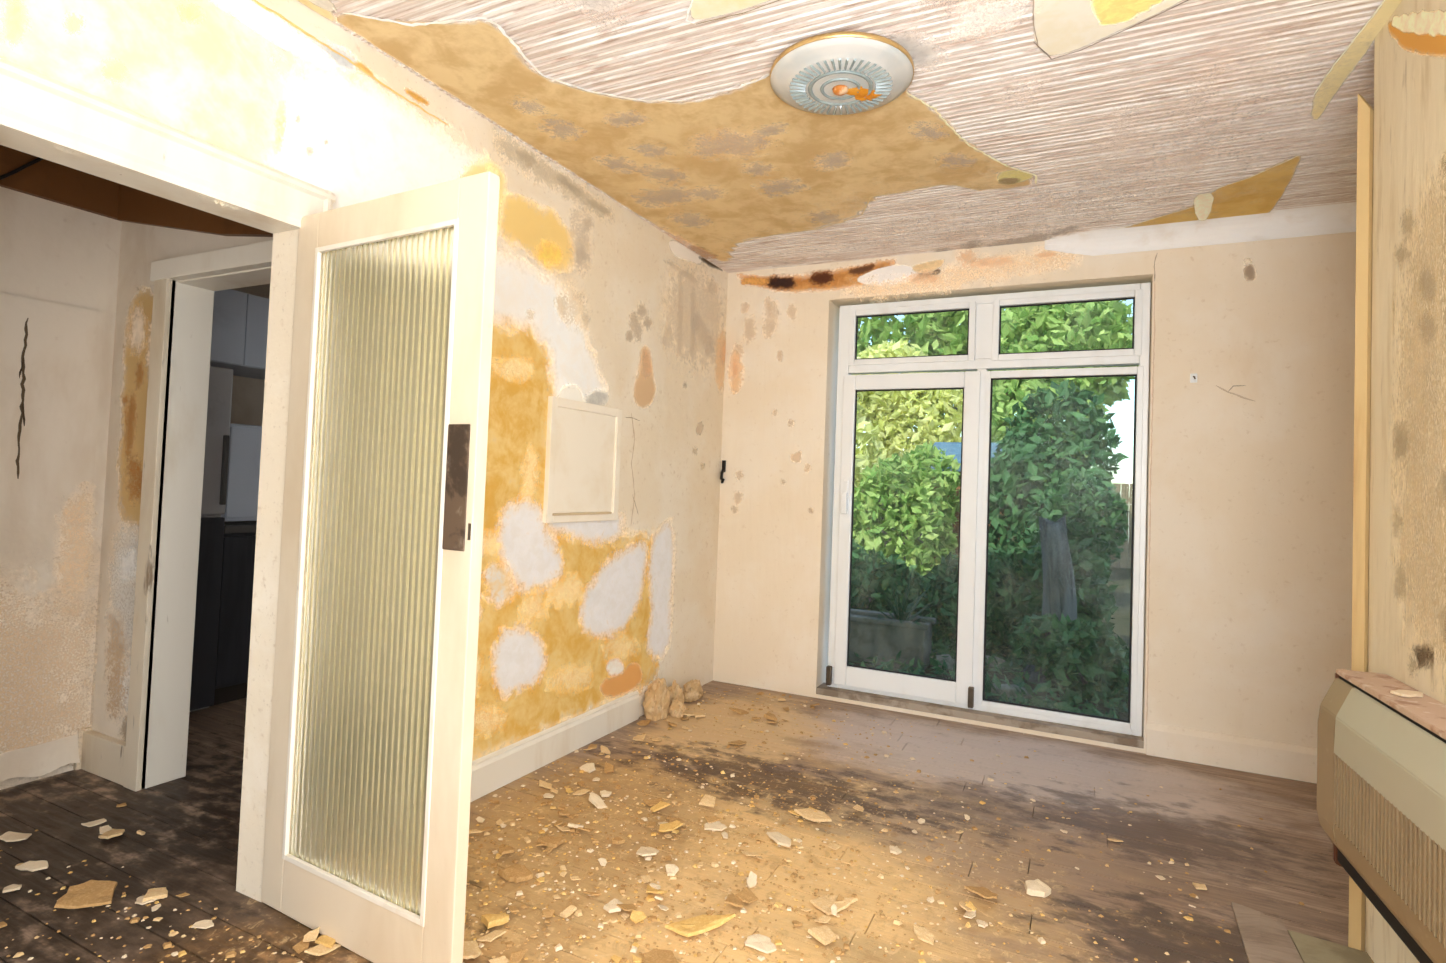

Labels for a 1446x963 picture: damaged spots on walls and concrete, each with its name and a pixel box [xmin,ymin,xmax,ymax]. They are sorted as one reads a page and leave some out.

peeling [955,0,1188,60]
peeling [1311,0,1446,120]
crack [16,318,28,479]
peeling [117,289,153,531]
flaking render [213,0,1037,761]
water stain [1393,160,1446,672]